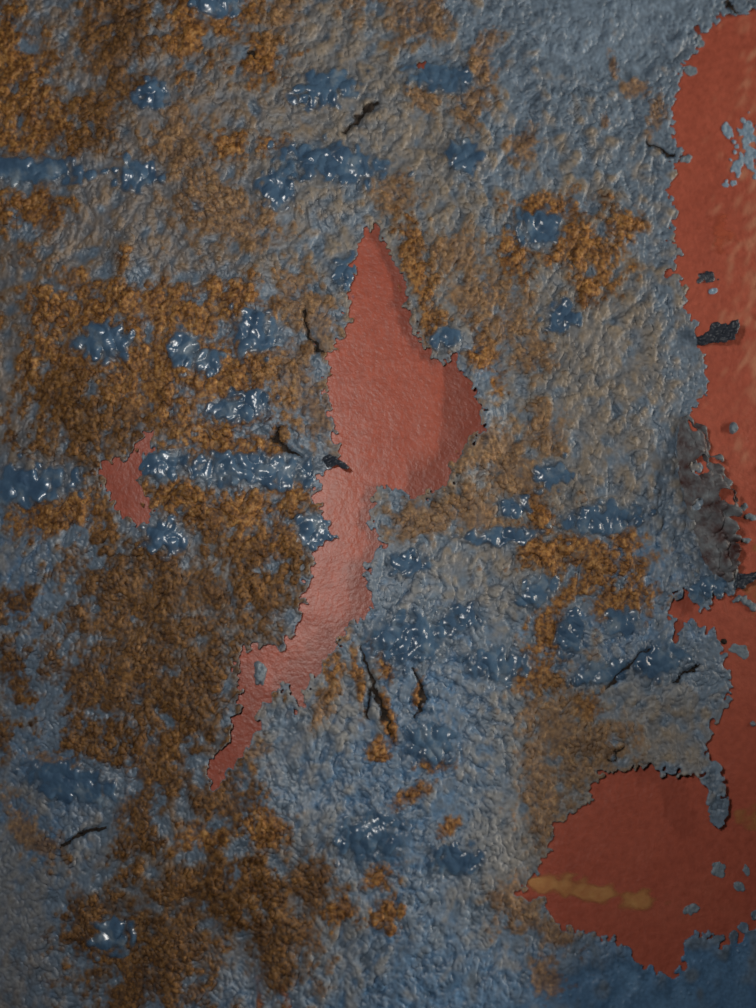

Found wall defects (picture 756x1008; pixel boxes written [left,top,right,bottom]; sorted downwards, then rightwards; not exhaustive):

rust [0,0,299,158]
rust [0,187,80,239]
rust [144,105,291,251]
rust [371,173,651,397]
peeling [98,431,156,528]
peeling [206,223,488,791]
rust [382,397,671,694]
peeling [514,8,756,979]
rust [0,245,406,1008]
rust [394,762,457,811]
rust [438,815,462,837]
rust [527,874,652,910]